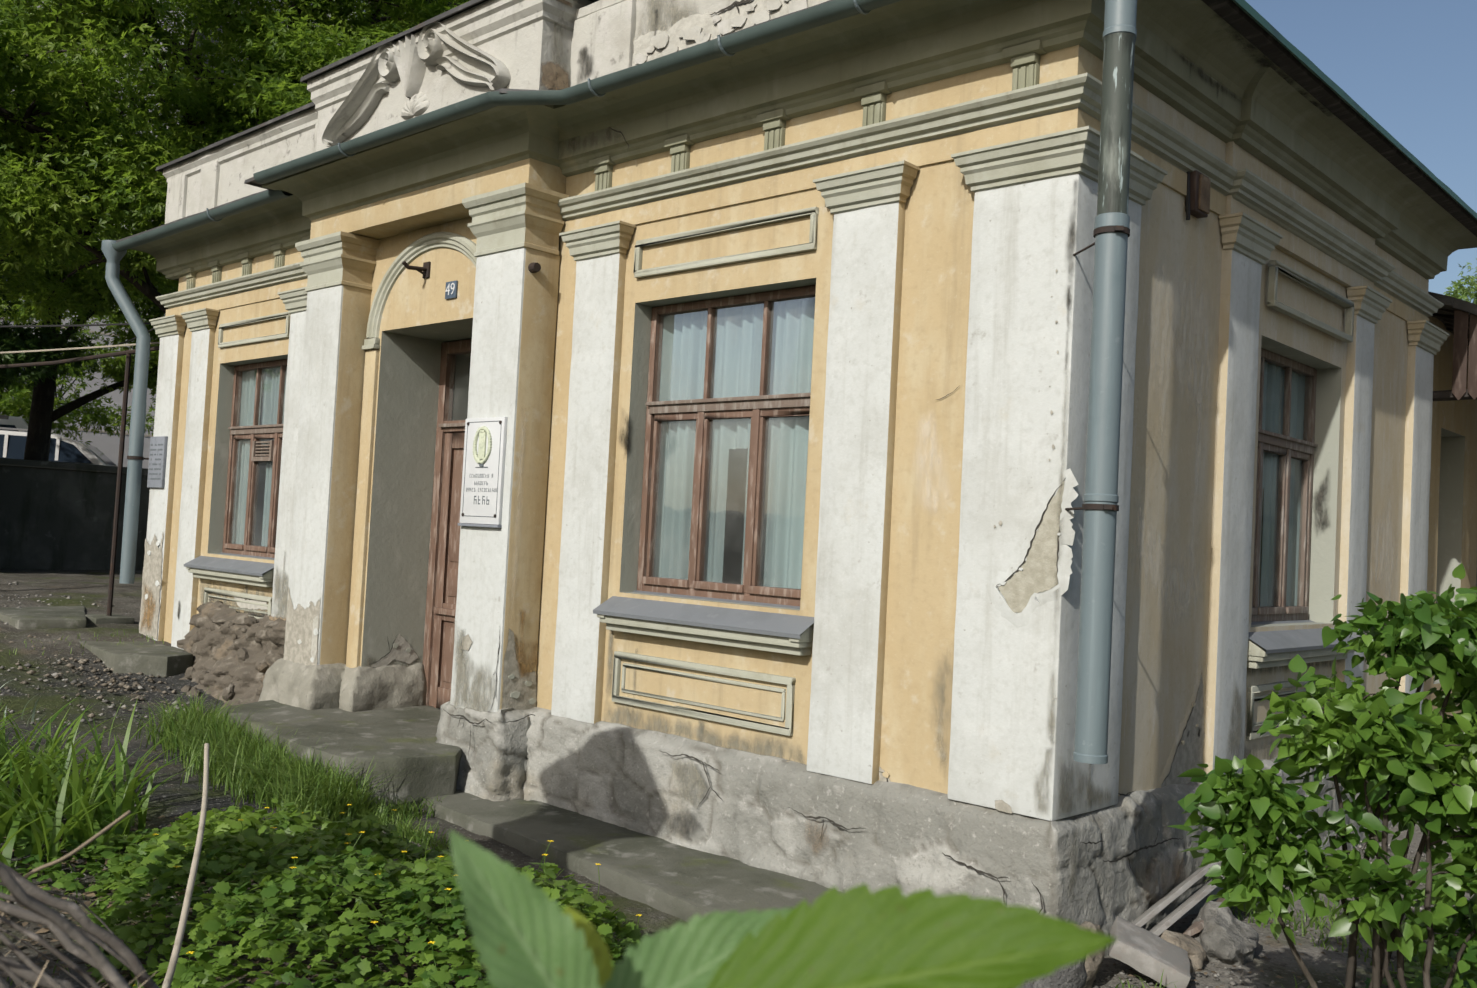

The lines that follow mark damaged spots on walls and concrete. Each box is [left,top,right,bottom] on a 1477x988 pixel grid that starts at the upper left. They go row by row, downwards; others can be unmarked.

spalling [632,0,829,66]
flaking render [541,62,569,90]
spalling [986,433,1079,628]
peeling [139,532,163,639]
flaking render [177,587,320,709]
peeling [502,629,537,714]
crack [660,751,723,806]
crack [788,807,865,838]